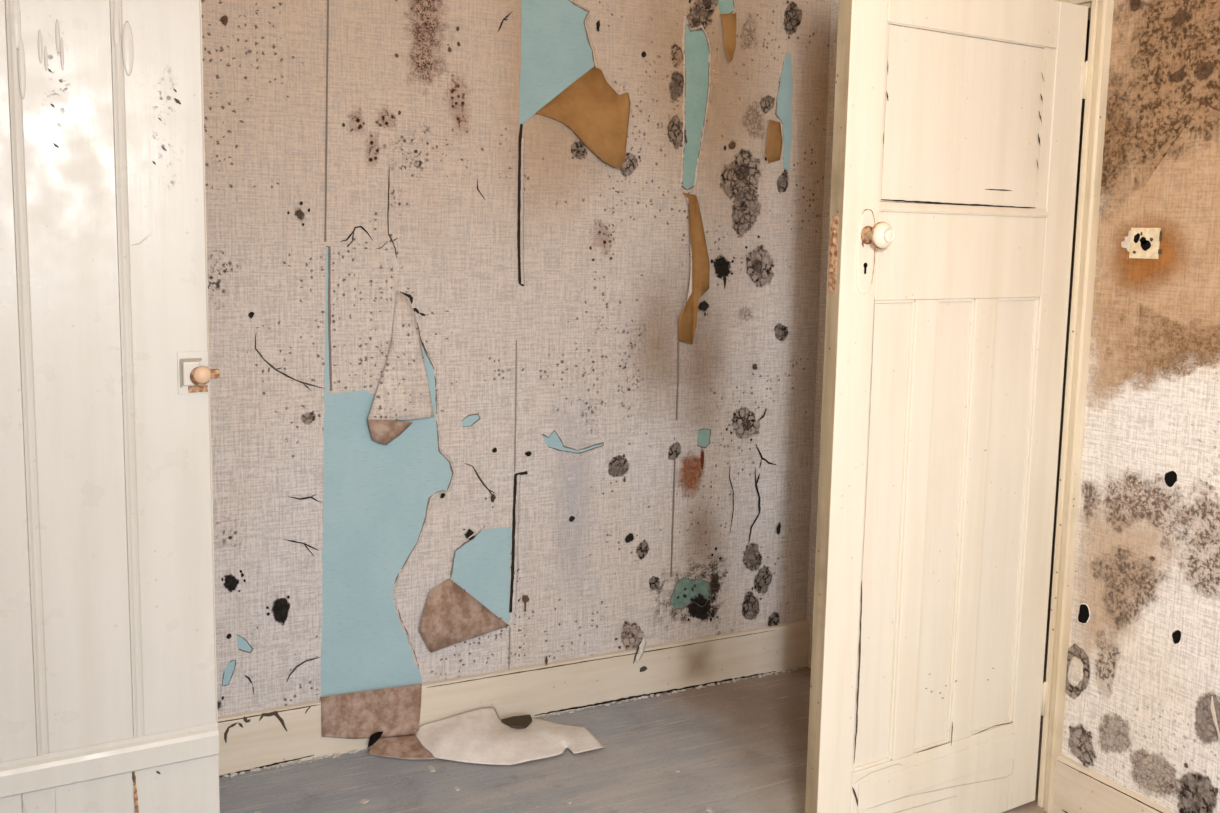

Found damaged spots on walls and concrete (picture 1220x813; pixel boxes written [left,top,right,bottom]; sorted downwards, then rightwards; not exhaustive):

mould [395,0,460,80]
water stain [689,0,712,26]
water stain [450,76,466,128]
water stain [1091,0,1220,396]
rust [1122,231,1178,284]
water stain [655,547,732,635]
water stain [1083,472,1220,694]